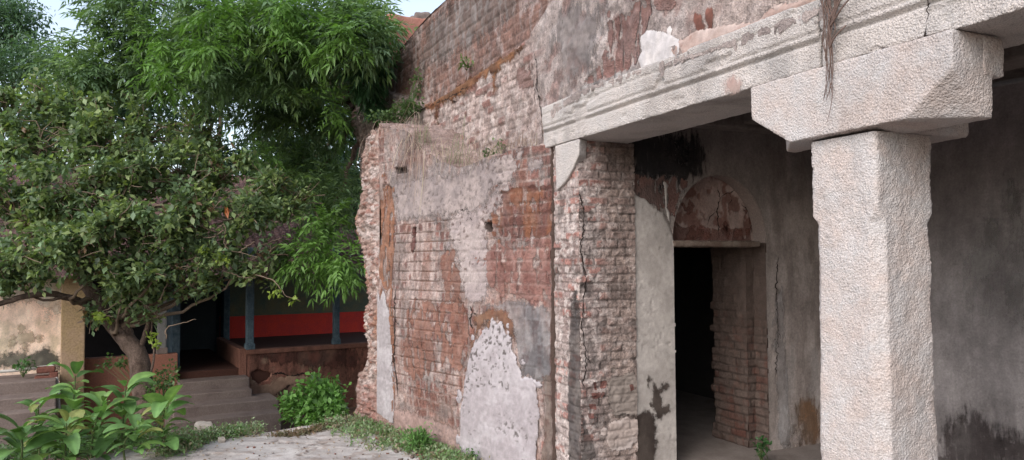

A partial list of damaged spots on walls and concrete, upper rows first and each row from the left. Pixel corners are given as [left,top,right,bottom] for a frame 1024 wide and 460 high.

spalling [551,0,825,118]
flaking render [377,151,552,460]
crack [579,192,590,390]
spalling [588,367,616,419]
flaking render [600,173,751,460]
leakage [939,406,1024,460]